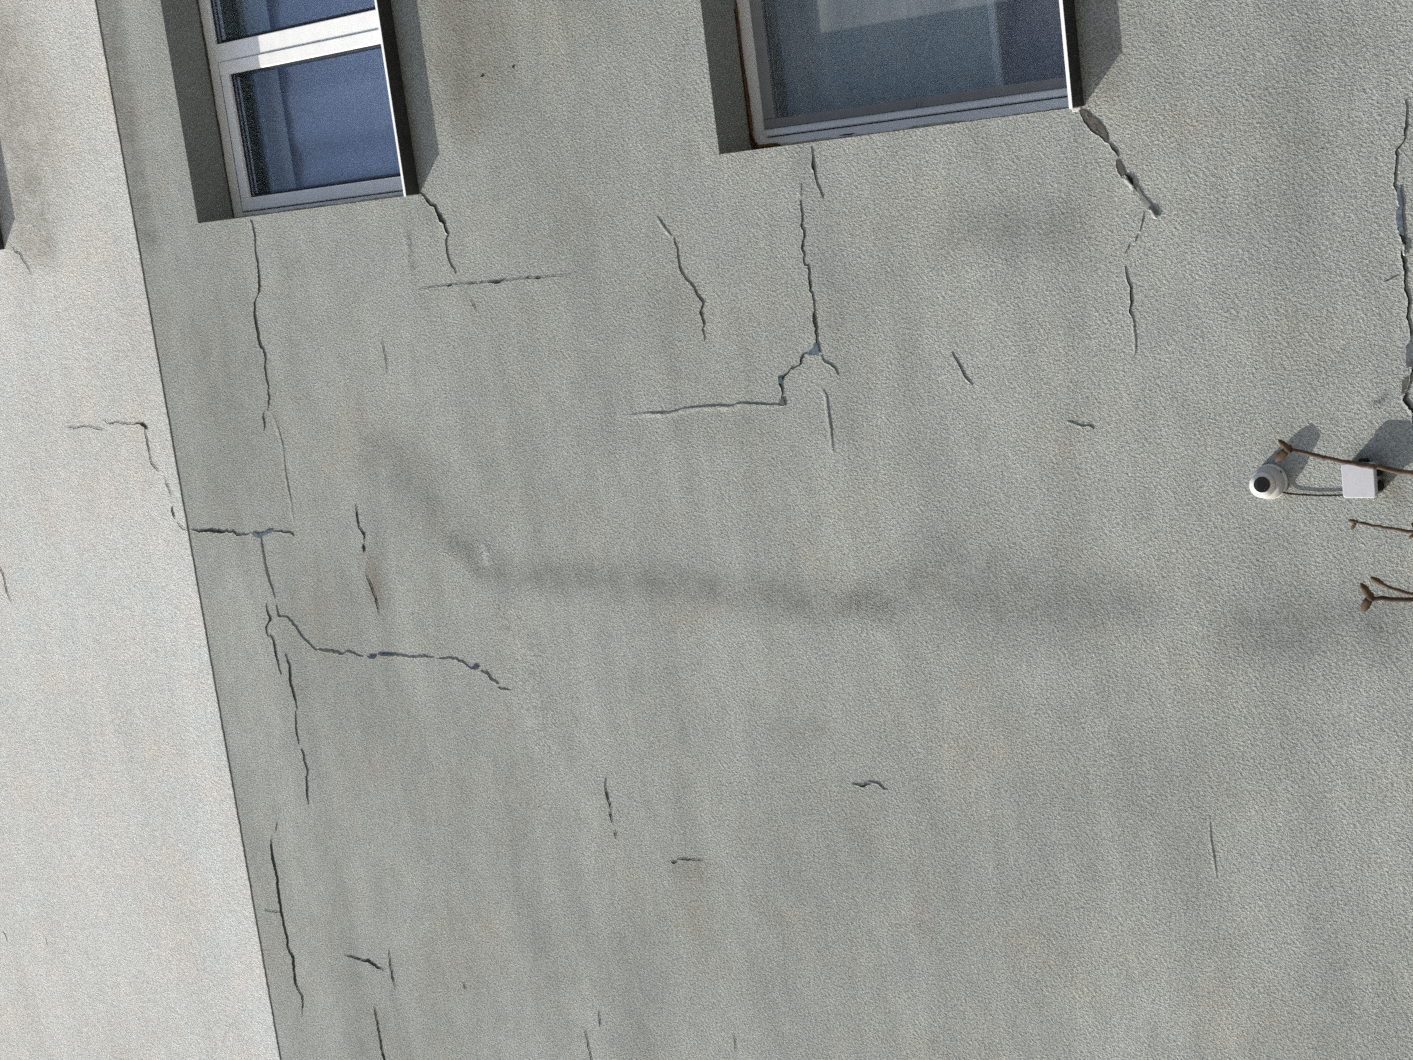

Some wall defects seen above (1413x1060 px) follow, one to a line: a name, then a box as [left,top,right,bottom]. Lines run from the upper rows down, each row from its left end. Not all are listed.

crack [417,193,568,312]
crack [673,238,706,341]
crack [734,147,839,408]
crack [1072,106,1158,328]
crack [1384,100,1413,439]
crack [65,419,510,805]
crack [264,821,303,1012]